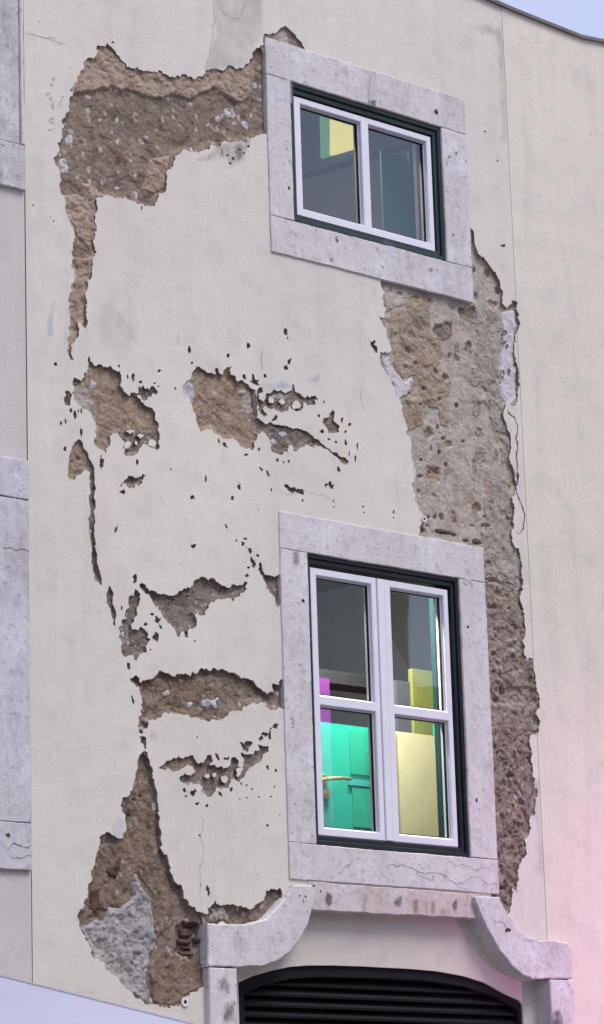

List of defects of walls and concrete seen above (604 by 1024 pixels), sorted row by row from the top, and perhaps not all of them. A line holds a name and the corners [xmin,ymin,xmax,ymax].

flaking render [46,27,302,360]
flaking render [60,358,282,1008]
flaking render [174,346,358,489]
flaking render [370,231,539,913]
crack [508,410,525,534]